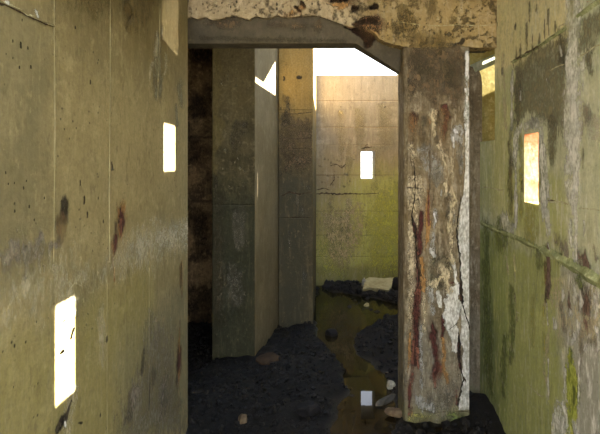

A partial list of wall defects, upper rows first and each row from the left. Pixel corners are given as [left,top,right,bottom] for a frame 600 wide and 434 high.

water stain [0,196,69,265]
rust [111,202,126,282]
crack [281,164,378,196]
crack [407,151,431,287]
rust [408,190,431,415]
peeling [408,51,469,410]
rust [429,315,449,389]
crack [420,198,470,421]
rust [544,257,552,302]
water stain [500,0,600,269]